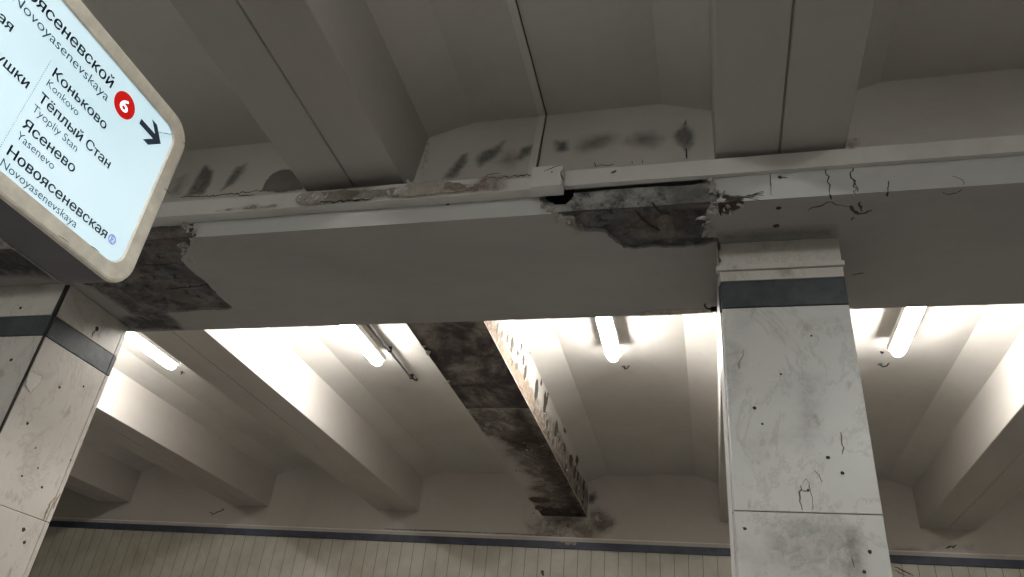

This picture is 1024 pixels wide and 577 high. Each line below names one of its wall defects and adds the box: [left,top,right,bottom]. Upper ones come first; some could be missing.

damp [478,146,500,163]
damp [676,119,692,159]
spalling [539,177,764,263]
crack [808,167,889,220]
spalling [0,240,49,276]
spalling [84,222,231,330]
peeling [496,323,585,506]
crack [798,470,822,510]